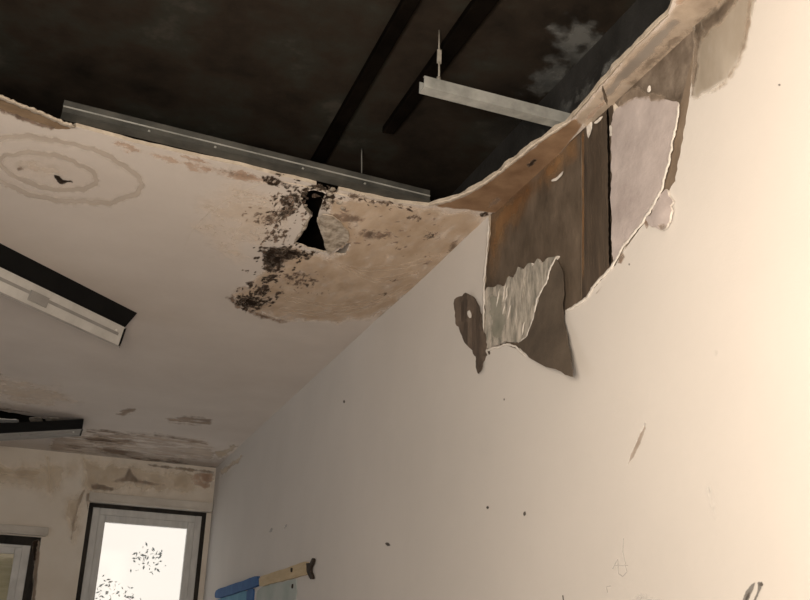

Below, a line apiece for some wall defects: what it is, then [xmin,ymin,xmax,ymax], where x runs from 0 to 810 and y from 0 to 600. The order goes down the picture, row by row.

damp [0,134,144,206]
damp [229,0,755,323]
peeling [453,29,697,377]
damp [52,429,239,539]
spalling [743,582,763,600]